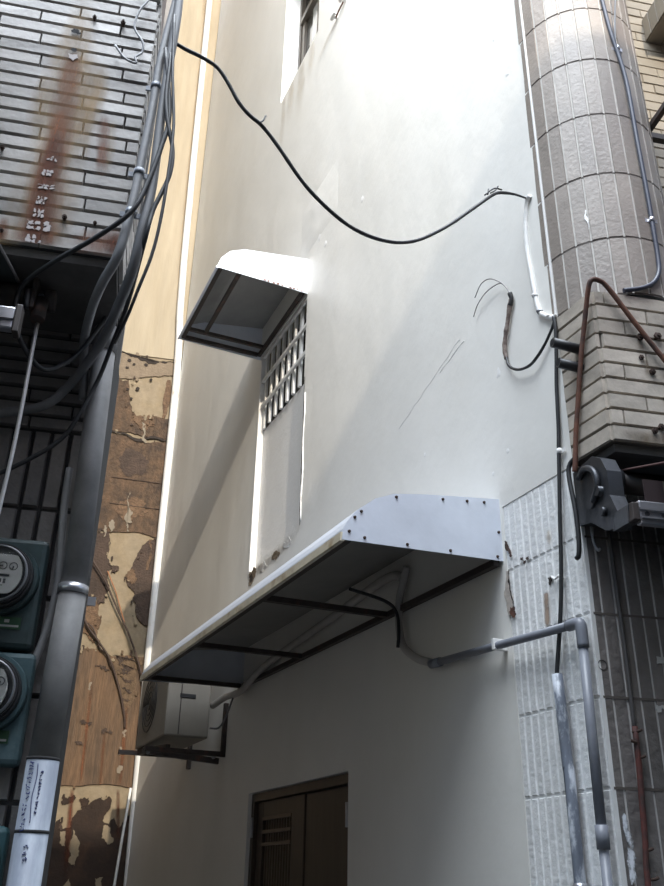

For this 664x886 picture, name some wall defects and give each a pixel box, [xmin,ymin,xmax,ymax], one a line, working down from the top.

corrosion [24,60,85,242]
peeling [61,351,182,794]